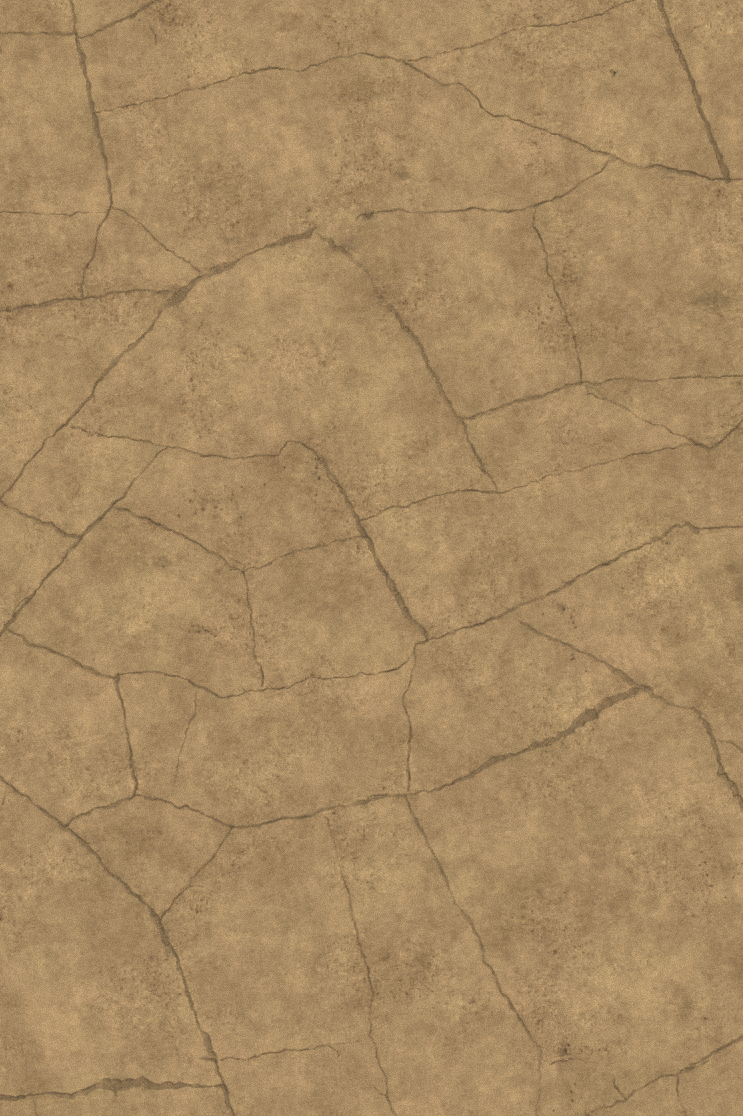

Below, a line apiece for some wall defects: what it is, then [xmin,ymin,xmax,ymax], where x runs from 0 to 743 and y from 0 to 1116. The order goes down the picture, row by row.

crack [120,2,154,21]
crack [78,40,113,204]
crack [658,0,730,182]
crack [266,233,337,251]
crack [397,315,428,366]
crack [671,423,740,449]
crack [11,500,160,621]
crack [343,492,660,826]
crack [115,672,140,797]
crack [2,785,90,828]
crack [103,952,229,1109]
crack [0,1092,66,1100]